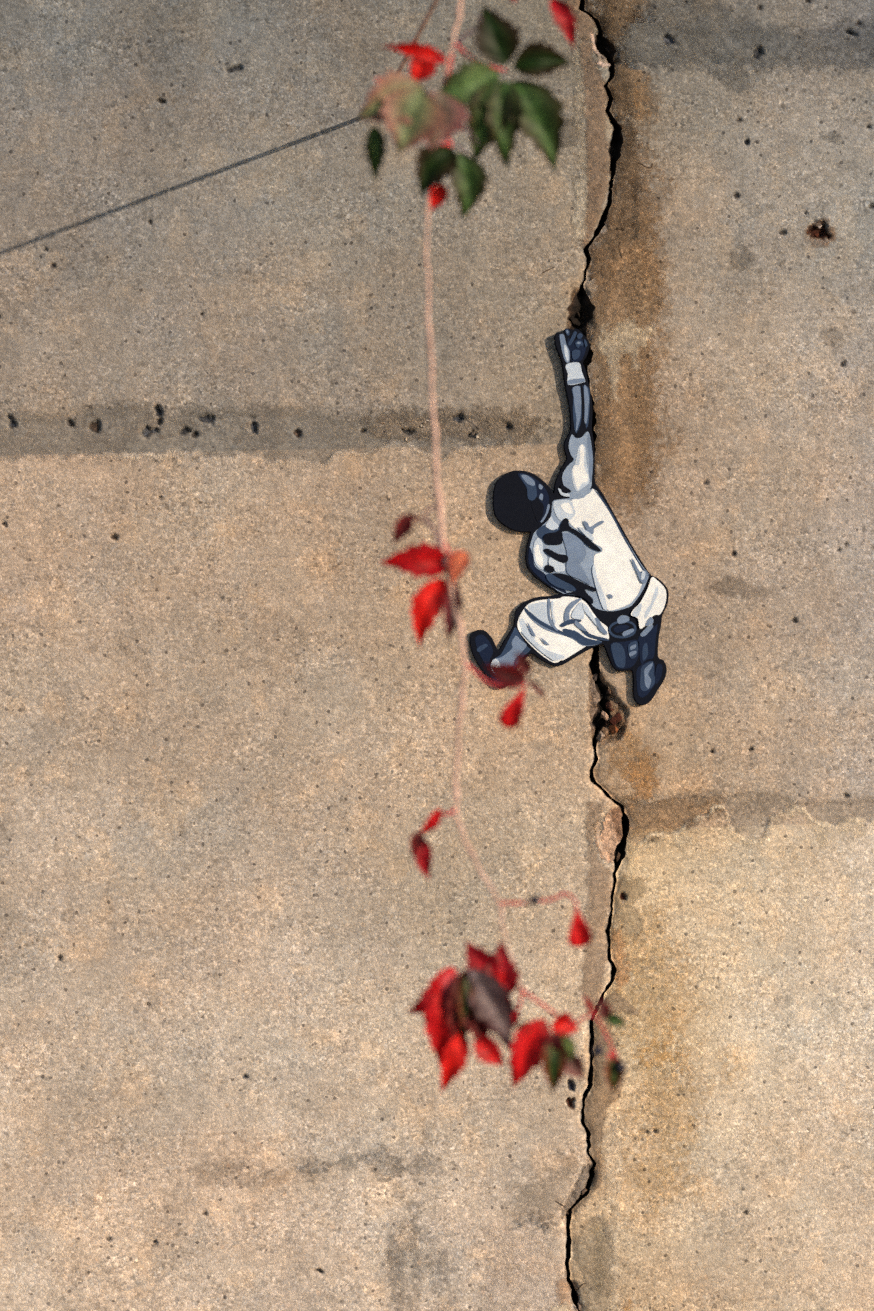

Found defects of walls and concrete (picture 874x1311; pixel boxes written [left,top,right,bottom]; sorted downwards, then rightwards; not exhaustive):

water stain [561,0,610,245]
crack [542,0,653,453]
corrosion [806,220,836,246]
water stain [598,319,653,399]
crack [556,645,630,1311]